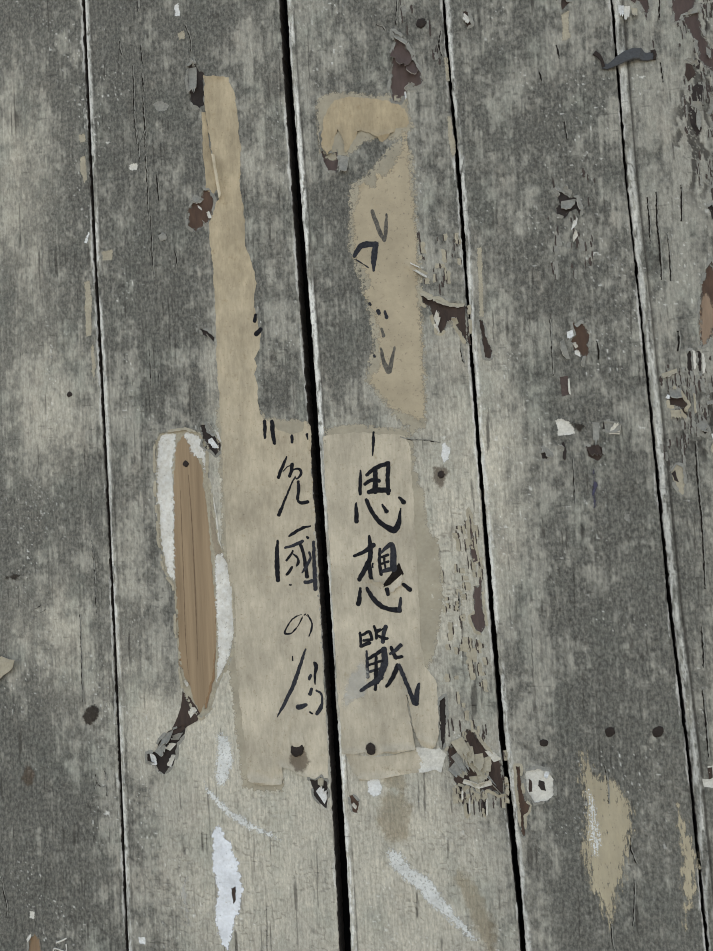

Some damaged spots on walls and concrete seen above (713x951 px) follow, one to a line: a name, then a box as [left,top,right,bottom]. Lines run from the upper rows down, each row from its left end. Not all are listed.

peeling [387,0,426,105]
peeling [427,20,450,81]
peeling [618,0,653,21]
peeling [668,0,713,138]
peeling [185,187,217,232]
peeling [696,151,713,219]
peeling [410,232,493,361]
peeling [560,320,592,367]
peeling [659,257,713,495]
peeling [145,422,236,774]
peeling [437,507,557,838]